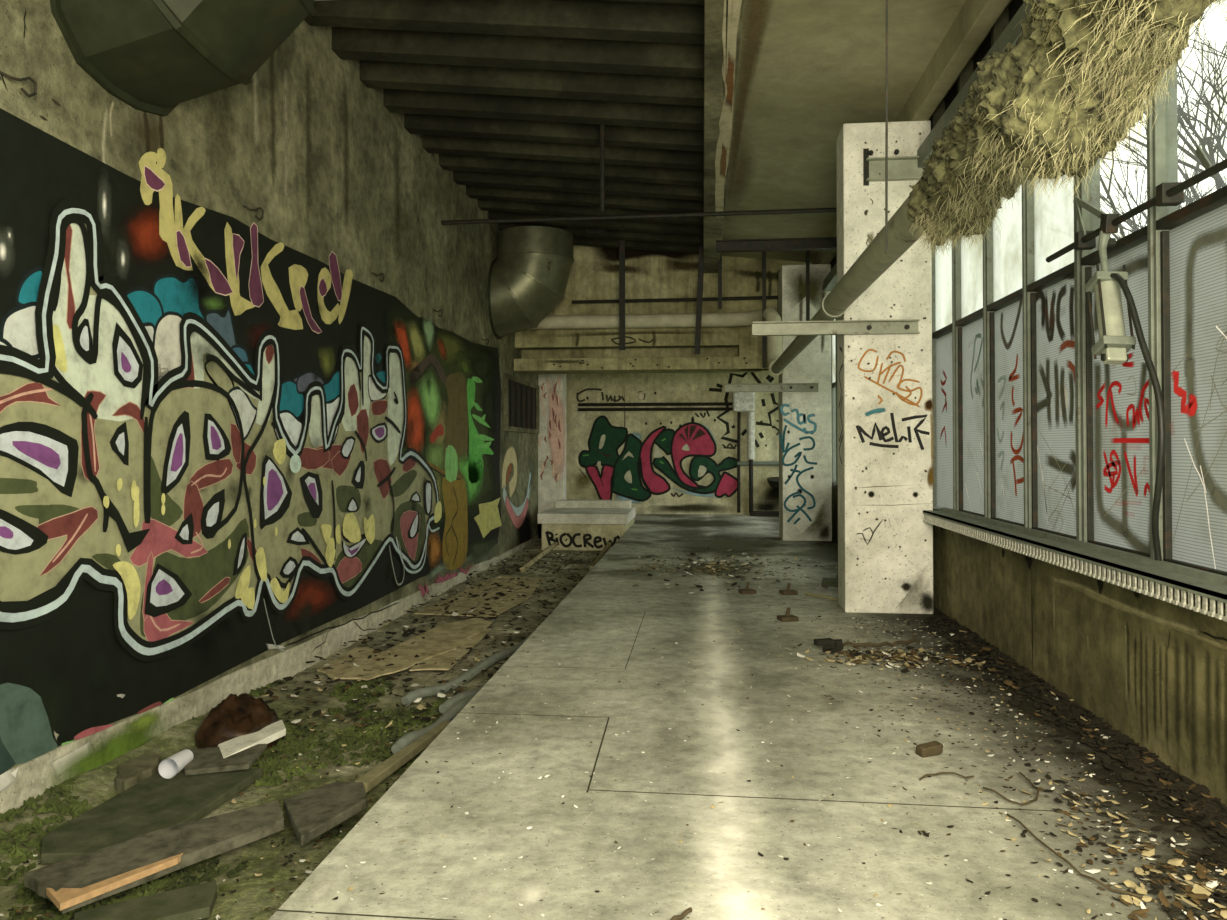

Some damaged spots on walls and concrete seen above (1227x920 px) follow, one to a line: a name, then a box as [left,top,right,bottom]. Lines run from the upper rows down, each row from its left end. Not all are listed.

damp [1053,577,1227,780]